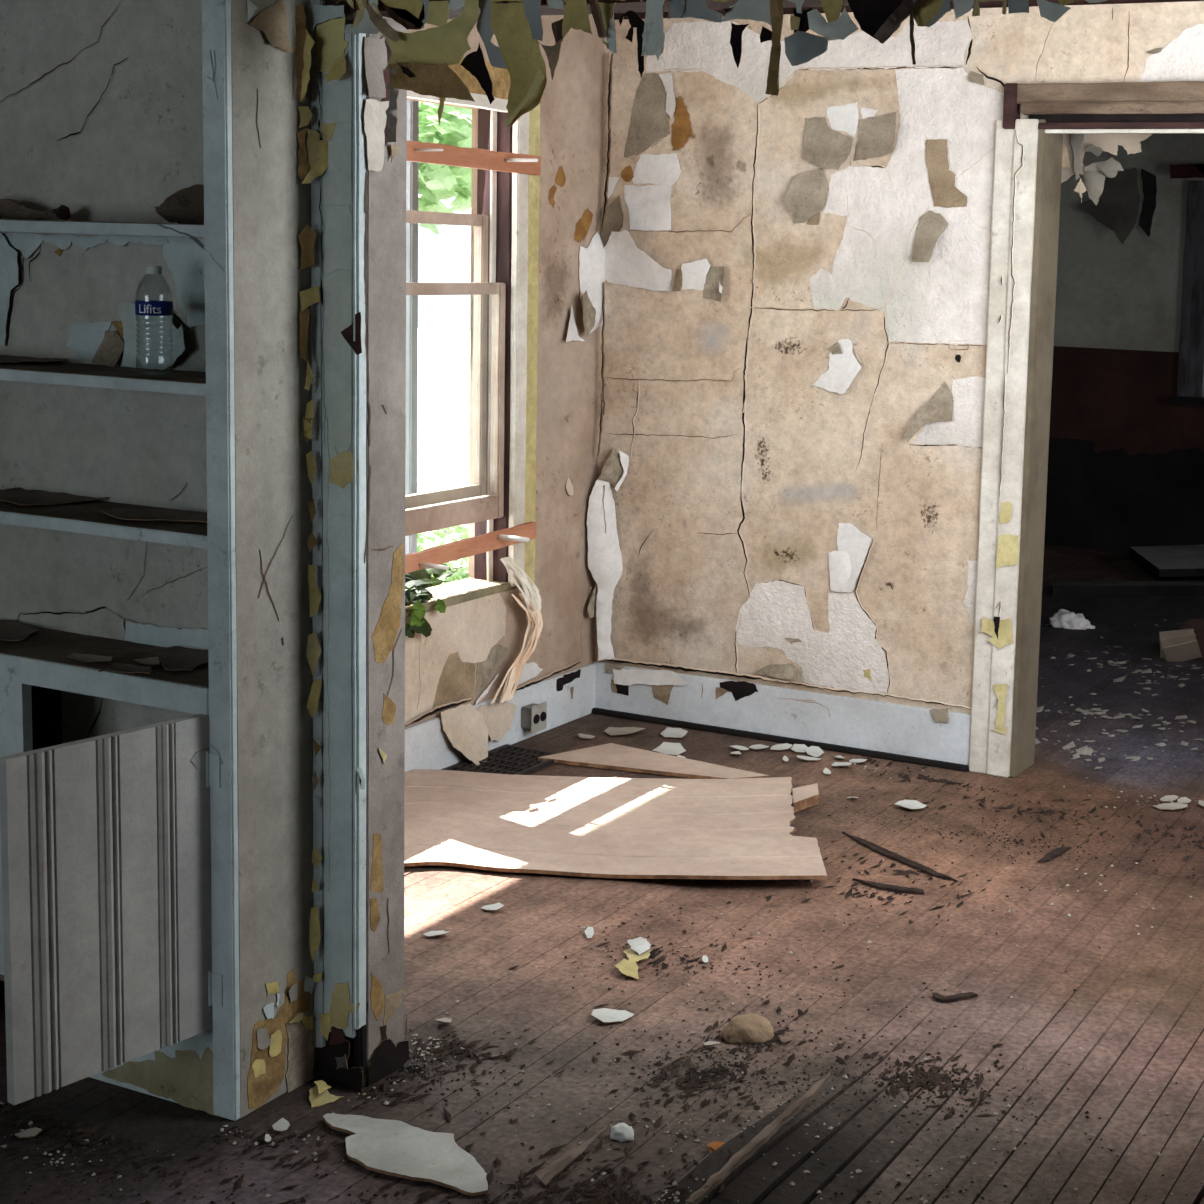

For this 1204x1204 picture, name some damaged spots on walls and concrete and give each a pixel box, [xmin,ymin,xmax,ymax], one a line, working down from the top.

crack [0,0,129,143]
peeling [247,0,626,213]
peeling [607,0,1107,345]
crack [1035,24,1053,82]
crack [1112,7,1131,82]
peeling [1140,24,1204,82]
peeling [0,233,205,370]
crack [511,16,1024,718]
crack [405,633,472,726]
peeling [371,542,516,742]
peeling [715,523,889,701]
peeling [247,833,403,1109]